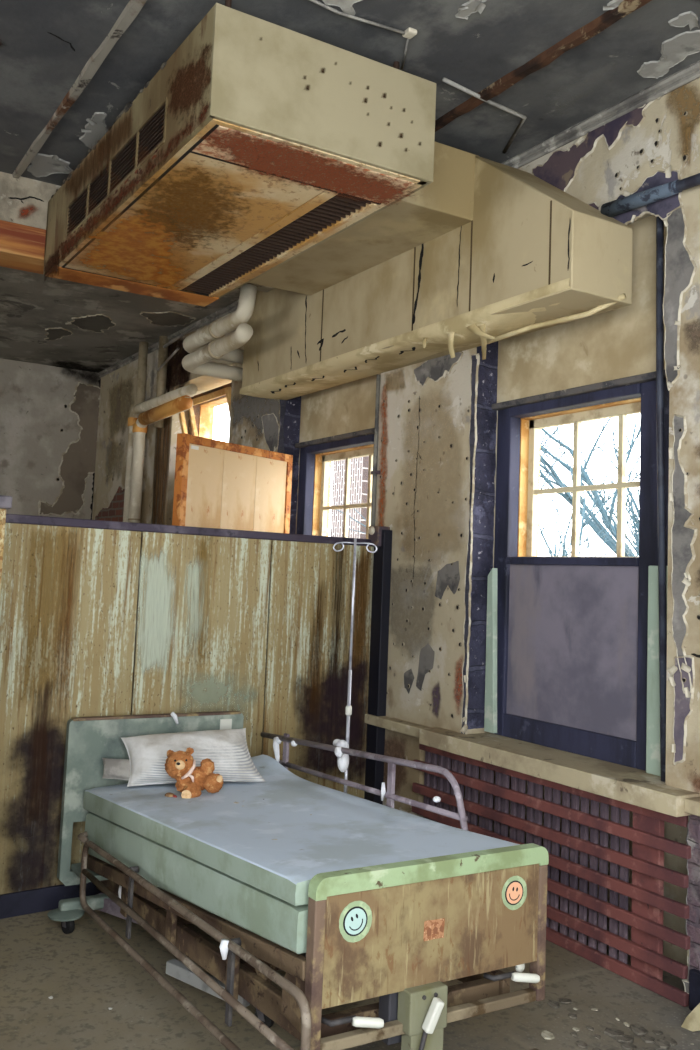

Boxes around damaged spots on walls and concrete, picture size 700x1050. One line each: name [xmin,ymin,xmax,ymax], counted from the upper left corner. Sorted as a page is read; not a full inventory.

peeling [322,0,362,16]
peeling [637,11,700,79]
peeling [27,153,73,177]
rust [44,44,249,281]
rust [208,131,414,205]
spalling [532,96,697,391]
peeling [38,382,105,516]
water stain [297,545,373,782]
spalling [397,351,480,734]
spalling [668,414,700,765]
water stain [3,684,66,893]
flaking render [682,815,700,994]